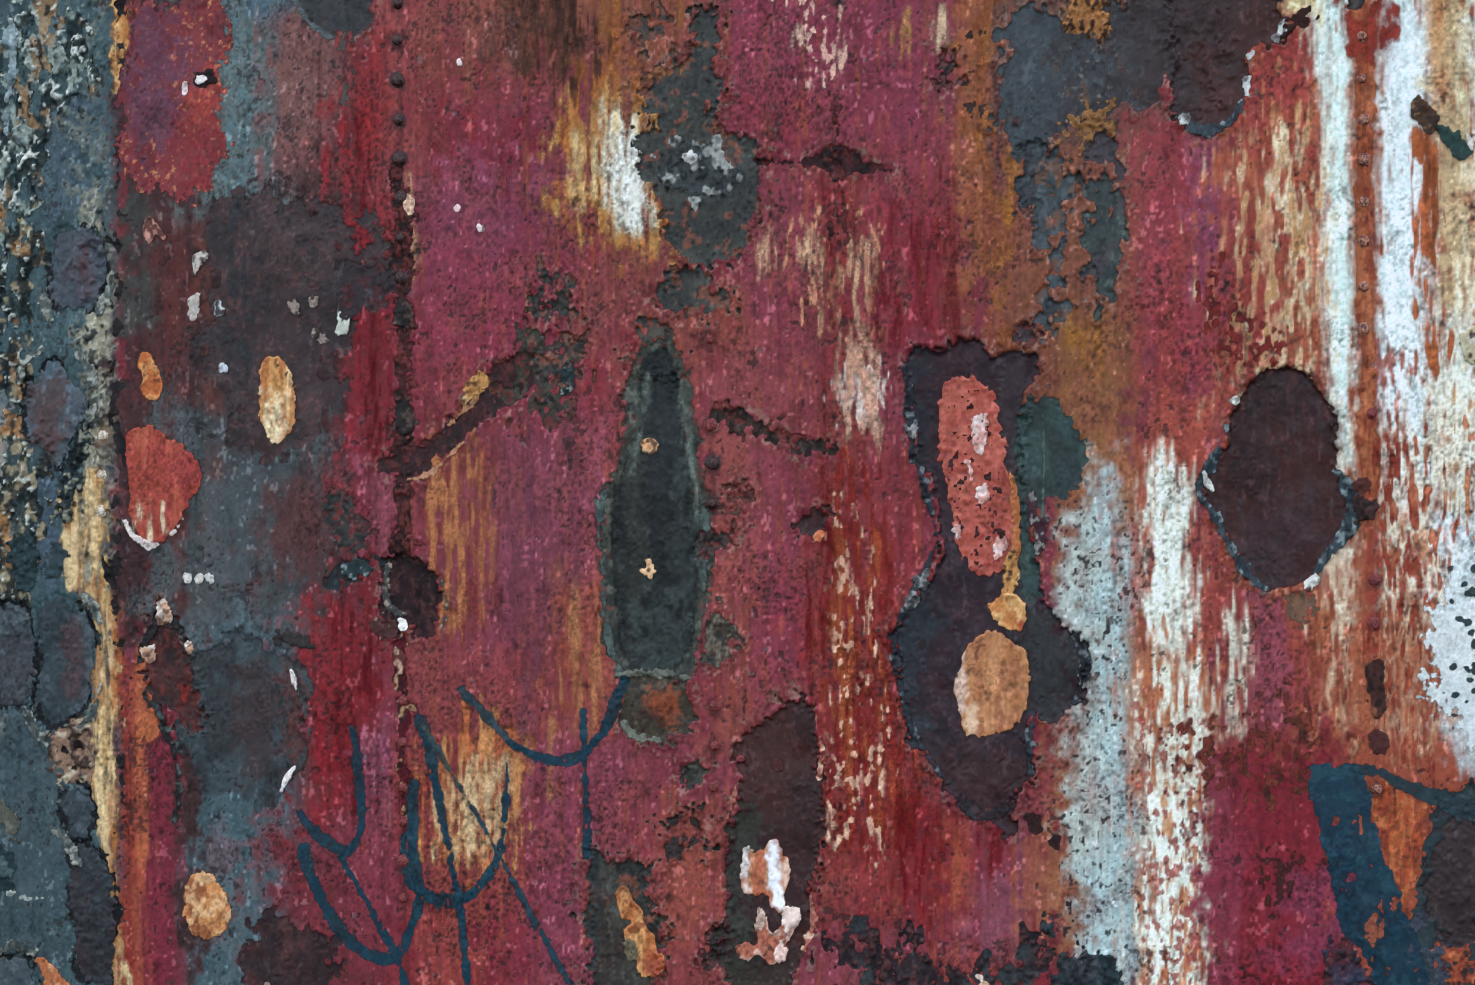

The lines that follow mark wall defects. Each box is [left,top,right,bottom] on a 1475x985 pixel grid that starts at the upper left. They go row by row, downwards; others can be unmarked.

peeling [0,0,104,607]
peeling [35,957,70,985]
peeling [46,712,99,787]
peeling [567,0,1320,985]
peeling [1195,366,1380,630]
rust [1168,0,1475,906]